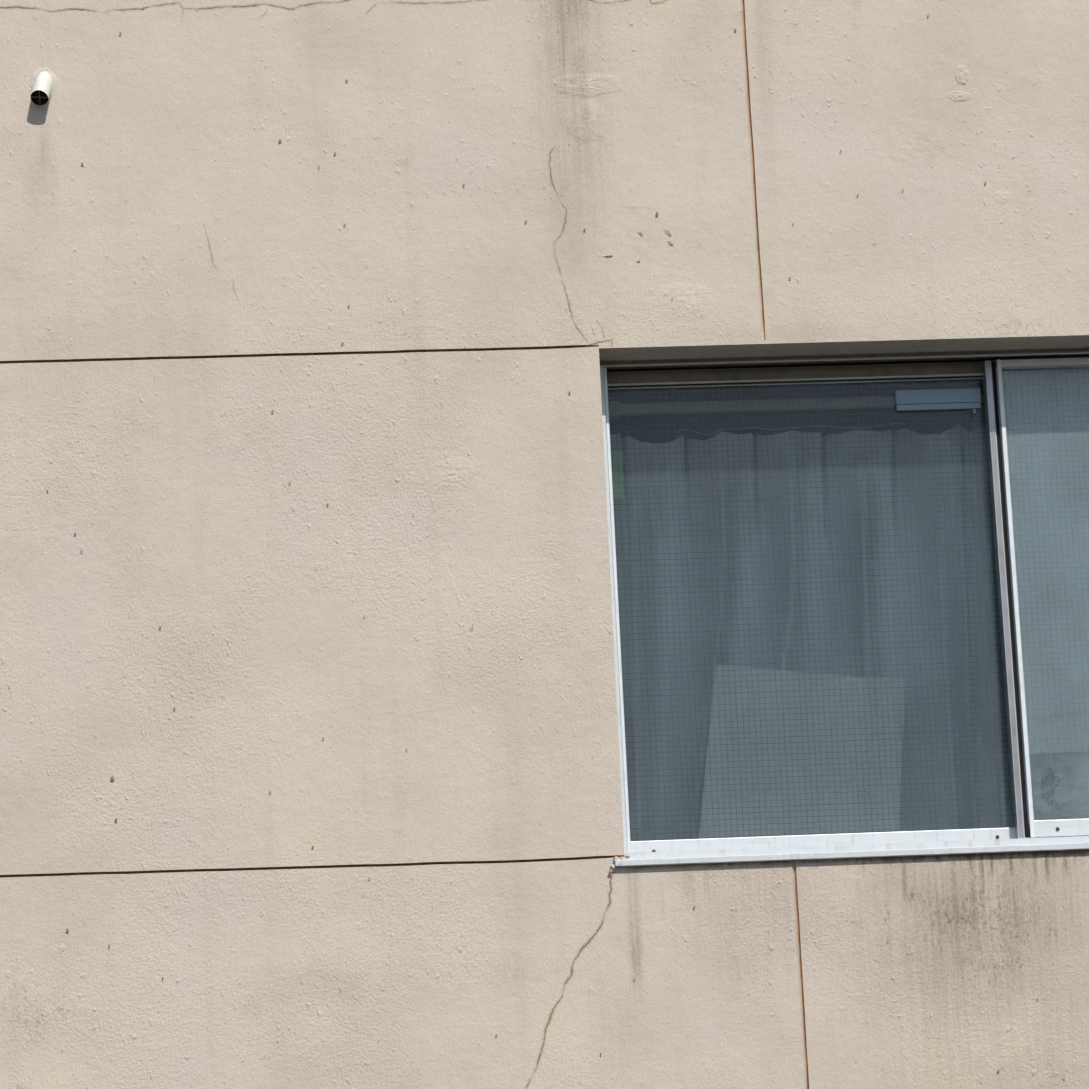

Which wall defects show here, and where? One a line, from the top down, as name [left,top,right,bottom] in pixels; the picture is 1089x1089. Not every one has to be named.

crack [0,3,313,12]
crack [526,873,613,1088]